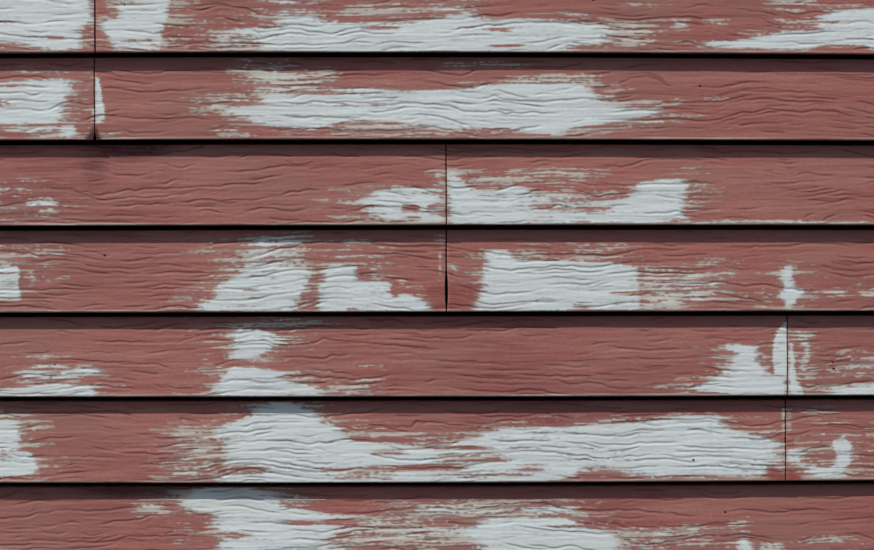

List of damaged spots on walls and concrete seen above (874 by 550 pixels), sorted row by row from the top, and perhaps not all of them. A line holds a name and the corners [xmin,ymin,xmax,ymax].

peeling [697,0,874,52]
peeling [0,0,704,139]
peeling [315,167,865,225]
peeling [0,245,69,301]
peeling [0,351,115,397]
peeling [132,232,874,550]
peeling [0,410,58,482]